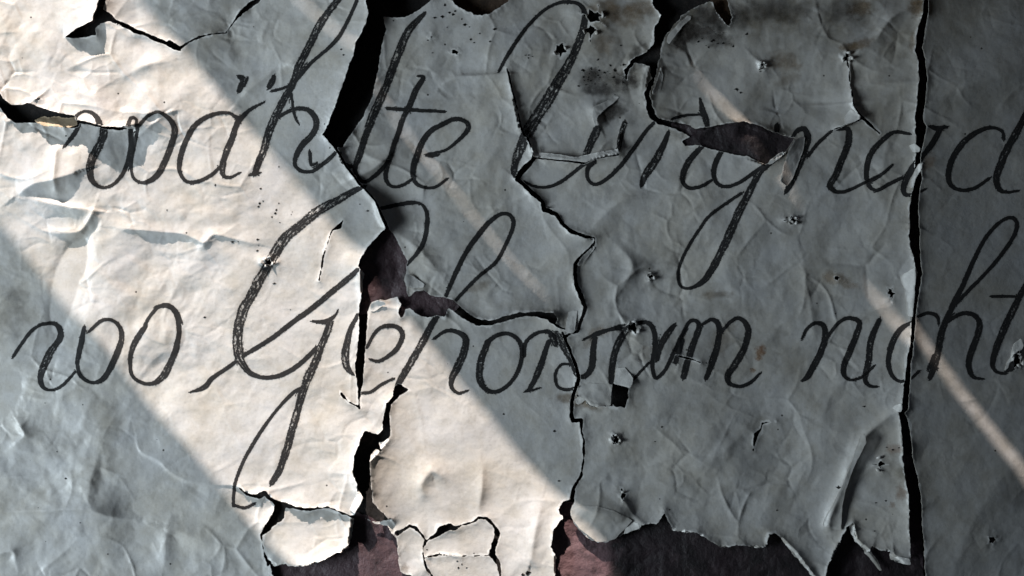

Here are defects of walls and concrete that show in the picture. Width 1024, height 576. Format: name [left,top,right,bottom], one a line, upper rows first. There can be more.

peeling [710,0,732,26]
peeling [671,121,794,164]
peeling [358,225,459,318]
crack [454,0,710,512]
crack [898,0,927,575]
peeling [262,508,499,576]
peeling [551,501,811,576]
peeling [826,525,924,576]